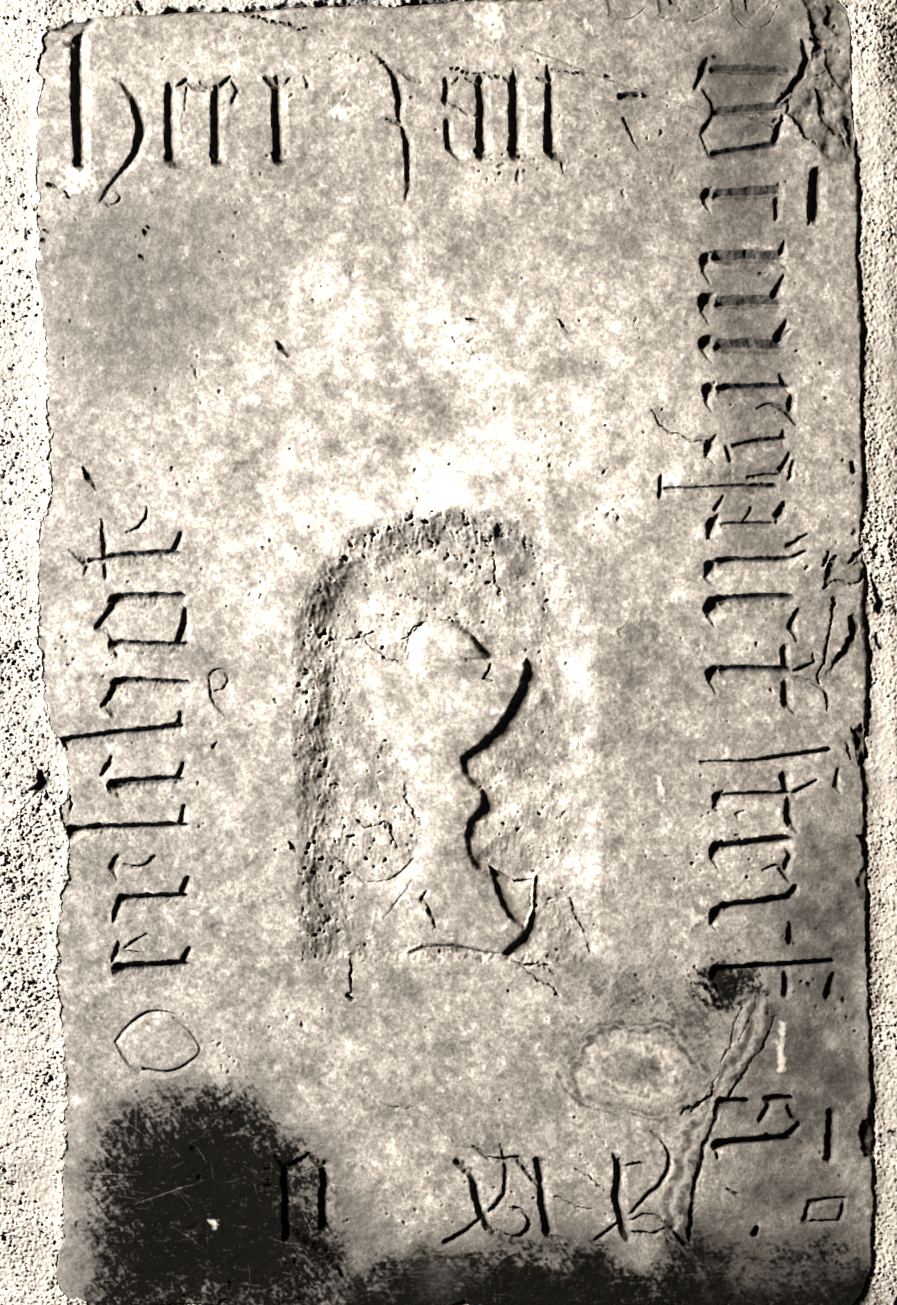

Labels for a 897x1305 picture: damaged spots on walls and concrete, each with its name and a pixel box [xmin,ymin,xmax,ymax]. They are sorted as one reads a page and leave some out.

crack [482,663,495,683]
water stain [83,1084,870,1305]
crack [680,997,779,1246]